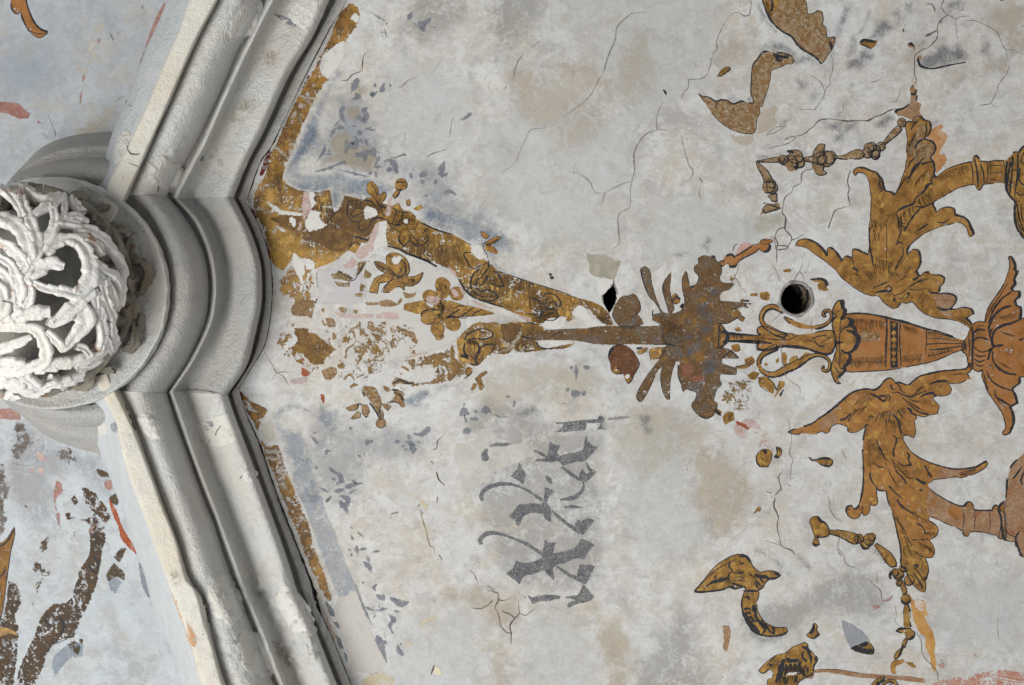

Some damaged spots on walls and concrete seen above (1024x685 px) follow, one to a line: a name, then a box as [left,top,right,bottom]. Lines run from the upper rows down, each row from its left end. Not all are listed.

crack [766,0,1021,148]
crack [578,3,752,249]
flaking render [266,192,327,233]
flaking render [292,253,315,290]
spalling [537,253,622,348]
spalling [727,269,829,318]
crack [772,169,811,281]
crack [828,171,851,229]
peeling [277,320,415,382]
crack [766,420,796,556]
peeling [0,487,126,685]
crack [471,571,535,639]